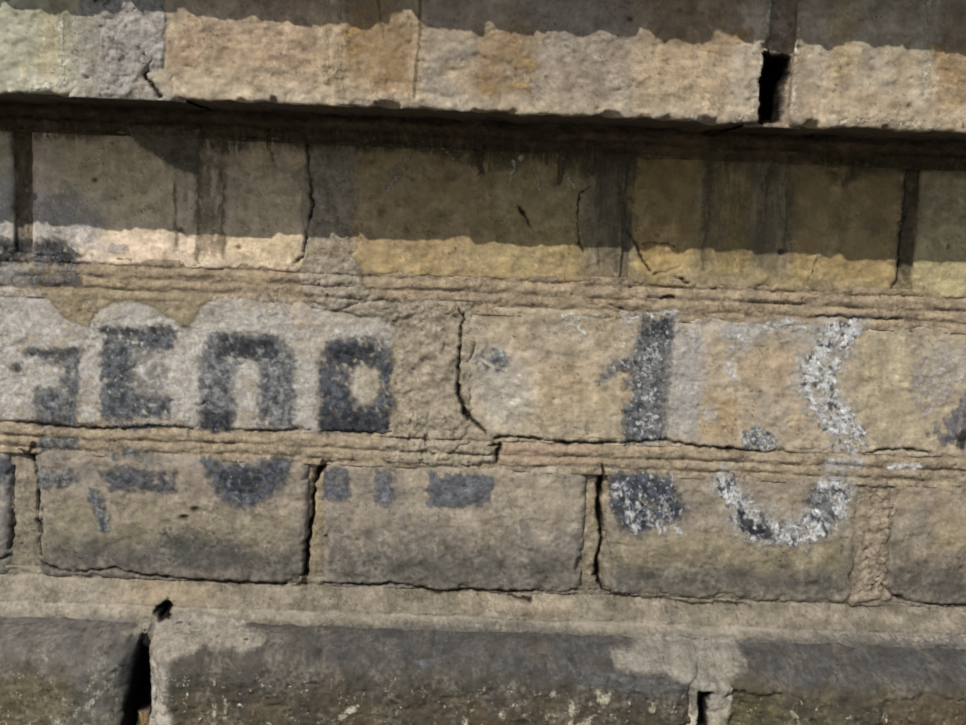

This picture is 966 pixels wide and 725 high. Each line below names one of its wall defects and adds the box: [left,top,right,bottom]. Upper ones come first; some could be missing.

crack [144,70,162,98]
crack [0,421,532,602]
crack [457,307,743,605]